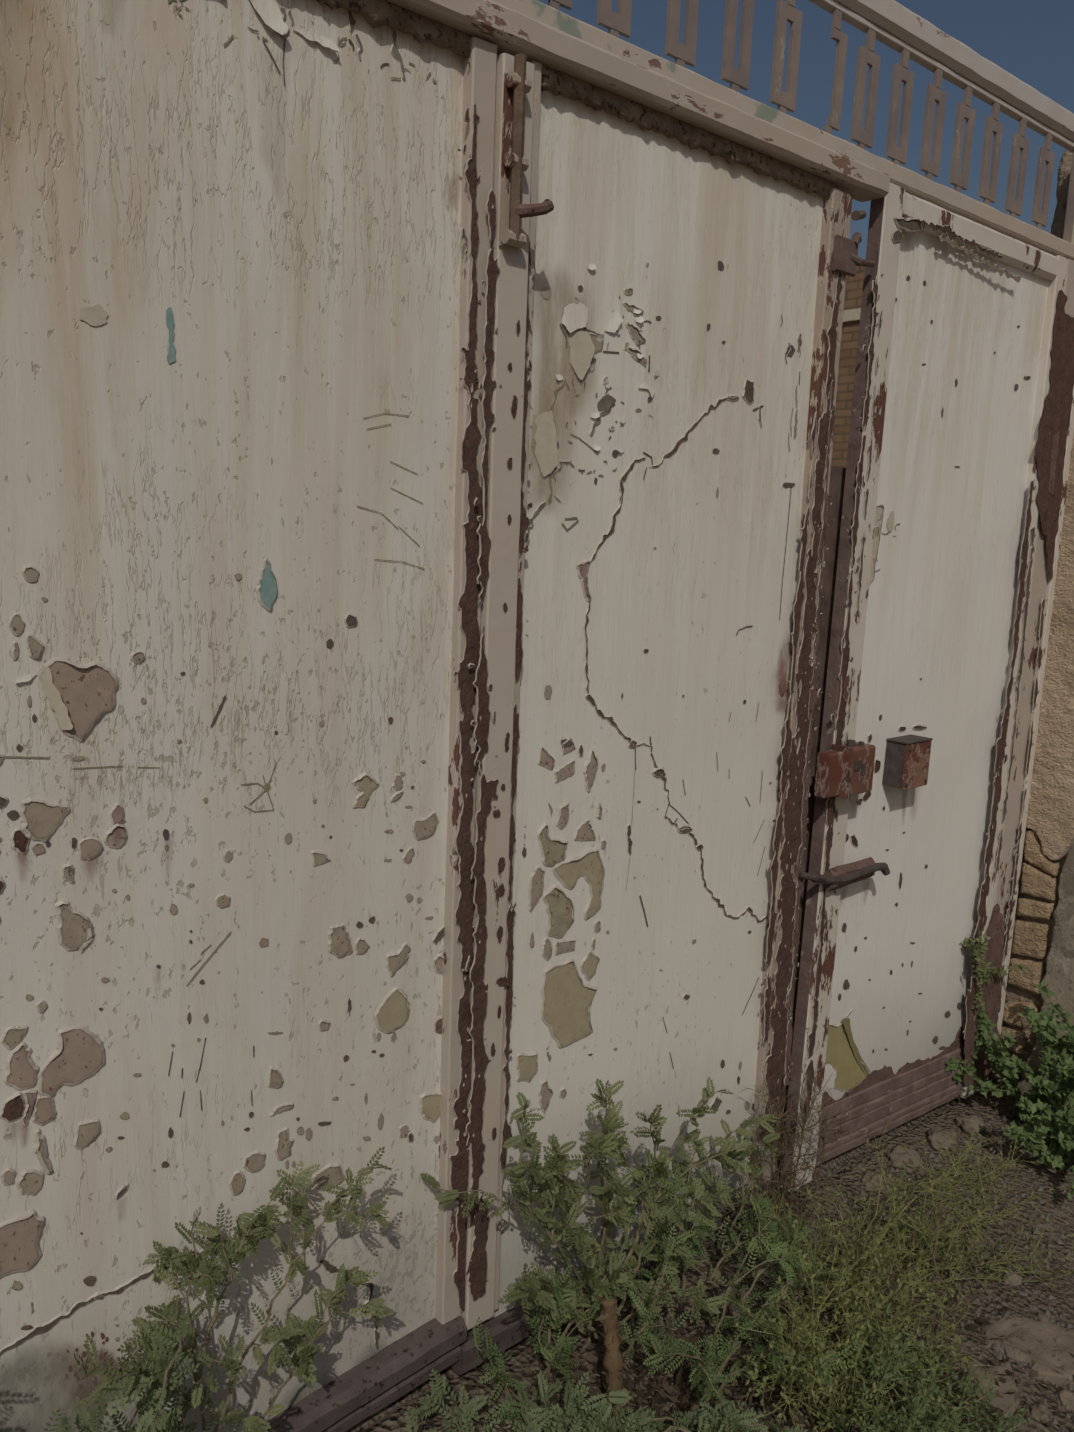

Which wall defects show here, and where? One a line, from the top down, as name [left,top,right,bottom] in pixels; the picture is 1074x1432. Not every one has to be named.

peeling [248,0,363,86]
peeling [525,285,661,544]
peeling [0,794,71,855]
peeling [8,612,119,761]
rust [449,102,537,1312]
peeling [516,737,609,1114]
crack [576,378,768,923]
rust [759,272,1074,1153]
spalling [1000,830,1061,1054]
peeling [0,1025,106,1330]
rust [66,1331,128,1409]
crack [0,1236,234,1356]